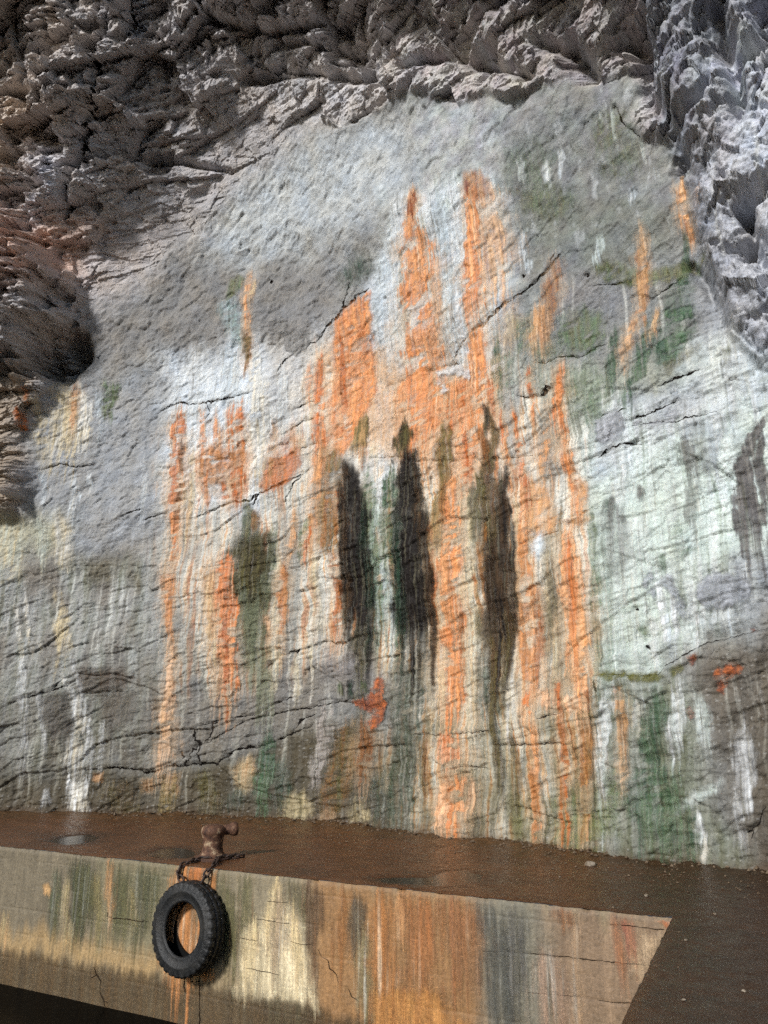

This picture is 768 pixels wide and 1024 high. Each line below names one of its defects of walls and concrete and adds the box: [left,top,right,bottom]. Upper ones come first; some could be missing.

crack [276,283,369,374]
corrosion [156,399,247,774]
crack [122,401,316,520]
leakage [175,190,453,828]
corrosion [260,172,593,845]
leakage [460,405,523,805]
crack [596,370,716,458]
leakage [705,331,768,577]
crack [67,636,366,774]
corrosion [165,902,199,954]
leakage [0,862,375,1024]
corrosion [372,896,446,1024]